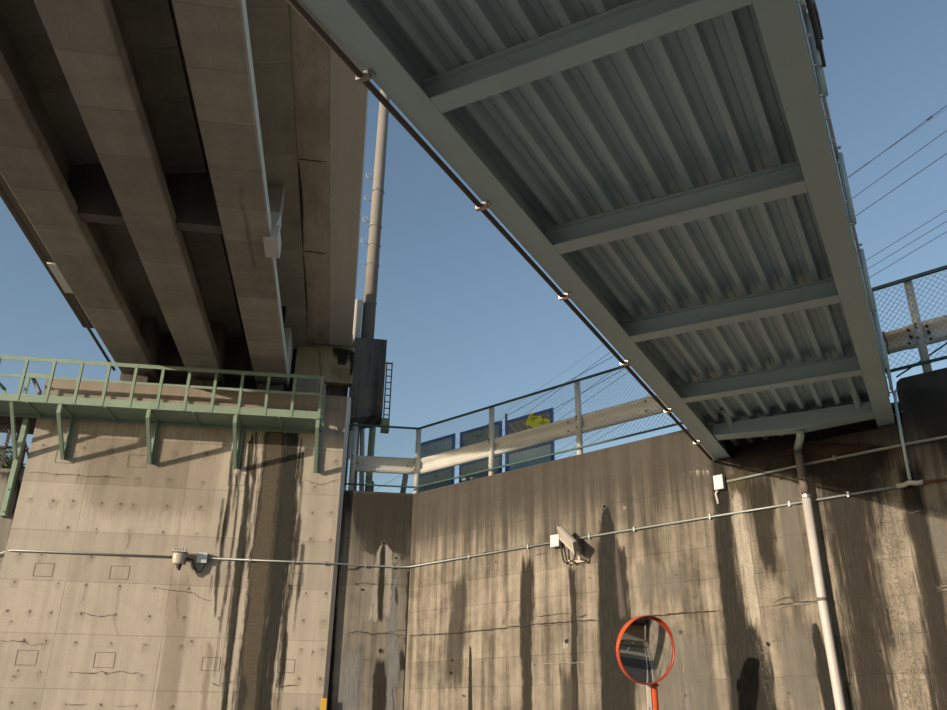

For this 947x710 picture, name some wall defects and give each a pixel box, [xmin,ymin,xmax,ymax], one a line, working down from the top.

damp [333,348,354,375]
damp [908,388,947,462]
damp [2,471,22,537]
damp [210,431,304,710]
damp [328,493,411,710]
damp [446,580,472,710]
damp [519,558,534,710]
damp [598,507,686,710]
damp [658,629,716,710]
damp [712,442,947,710]